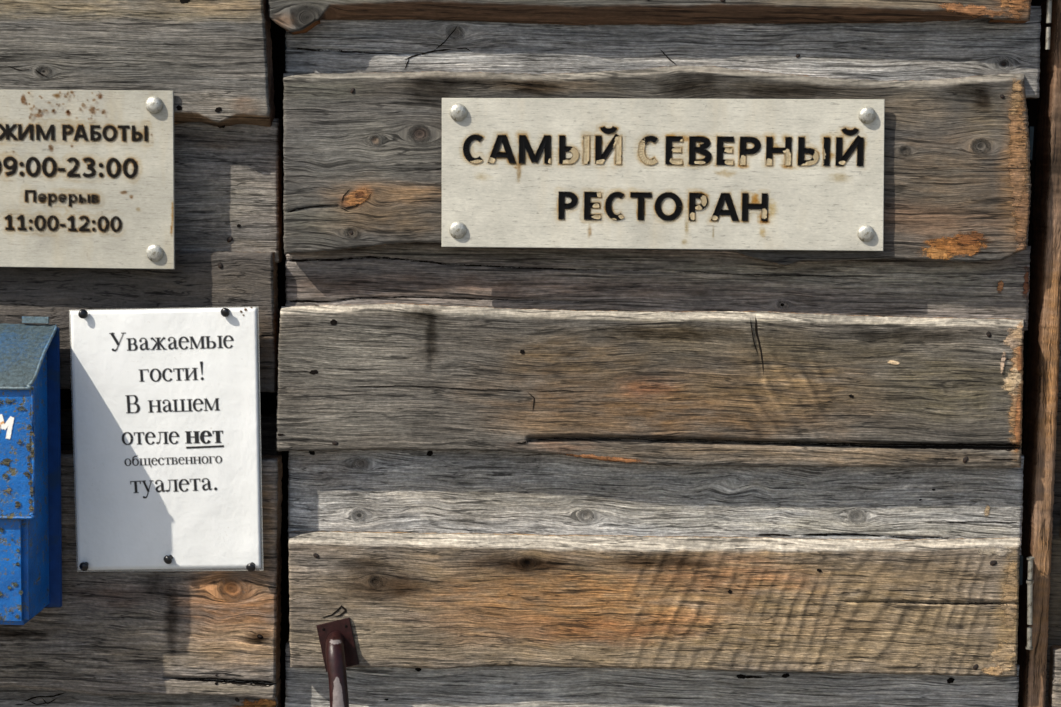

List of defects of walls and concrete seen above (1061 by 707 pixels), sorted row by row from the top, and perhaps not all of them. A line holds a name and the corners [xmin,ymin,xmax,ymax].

peeling [939,0,1030,20]
crack [290,23,472,68]
peeling [923,231,987,260]
peeling [1000,322,1023,452]
crack [516,437,1022,460]